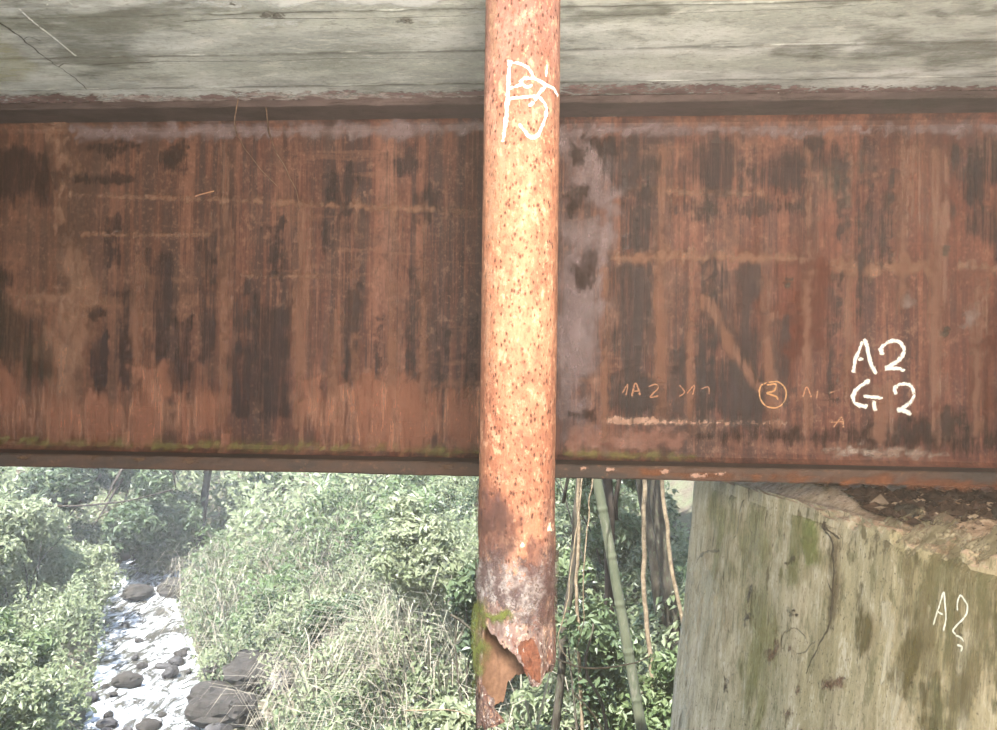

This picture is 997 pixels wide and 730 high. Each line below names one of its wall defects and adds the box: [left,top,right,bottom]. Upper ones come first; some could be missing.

damp [20,0,184,76]
damp [574,3,669,20]
damp [869,36,997,64]
rust [0,145,480,453]
rust [567,135,997,459]
rust [476,491,511,556]
damp [828,574,838,621]
rust [518,638,541,683]
damp [855,606,872,657]
damp [881,538,997,730]